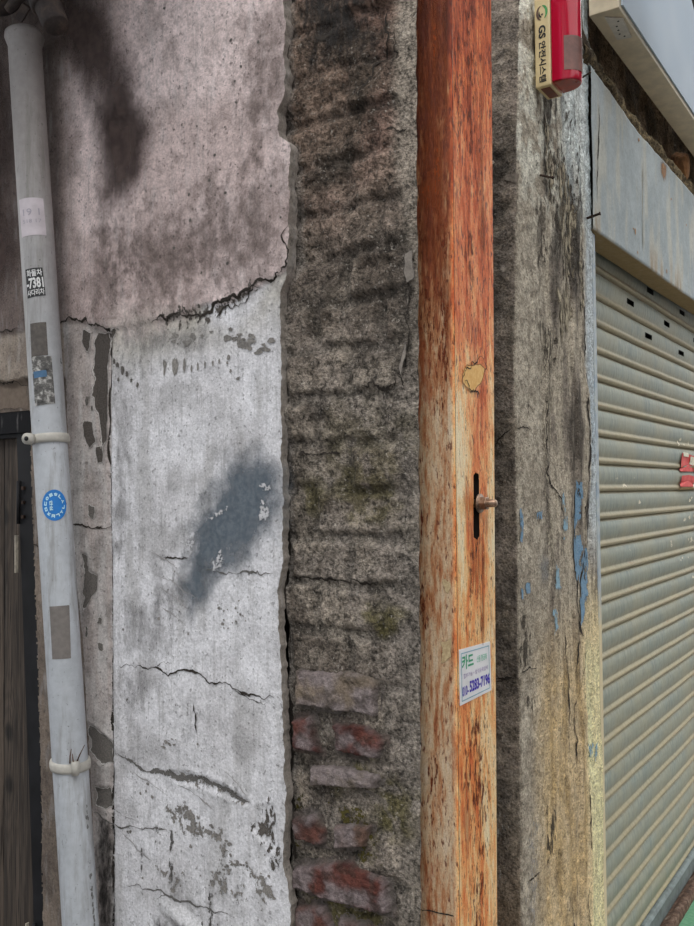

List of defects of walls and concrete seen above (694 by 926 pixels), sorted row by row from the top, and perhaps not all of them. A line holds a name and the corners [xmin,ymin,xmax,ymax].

water stain [60,0,143,198]
water stain [535,103,583,299]
crack [152,222,289,329]
crack [60,316,112,492]
peeling [82,328,139,463]
water stain [535,311,558,382]
water stain [183,568,209,604]
crack [205,569,377,661]
crack [73,514,297,926]
spalling [291,666,391,794]
peeling [139,782,281,911]
spalling [292,807,397,926]